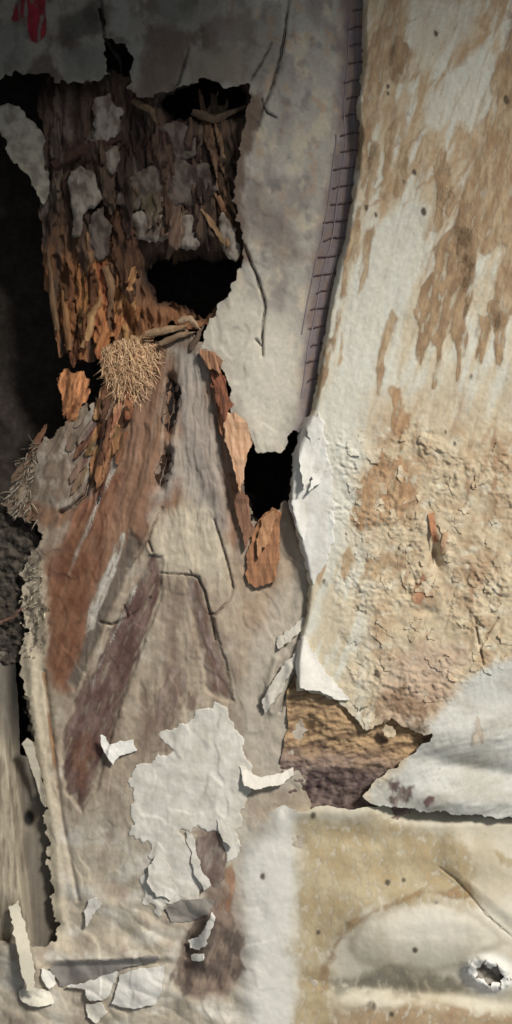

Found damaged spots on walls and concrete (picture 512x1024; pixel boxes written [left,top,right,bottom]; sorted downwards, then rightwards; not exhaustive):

crack [252,6,289,130]
peeling [68,93,218,262]
damp [341,0,416,297]
crack [245,251,266,349]
damp [317,318,342,395]
damp [377,310,398,394]
damp [476,300,509,365]
peeling [87,533,125,631]
crack [165,527,234,639]
peeling [288,412,512,703]
peeling [19,556,440,1023]
spalling [466,959,512,992]